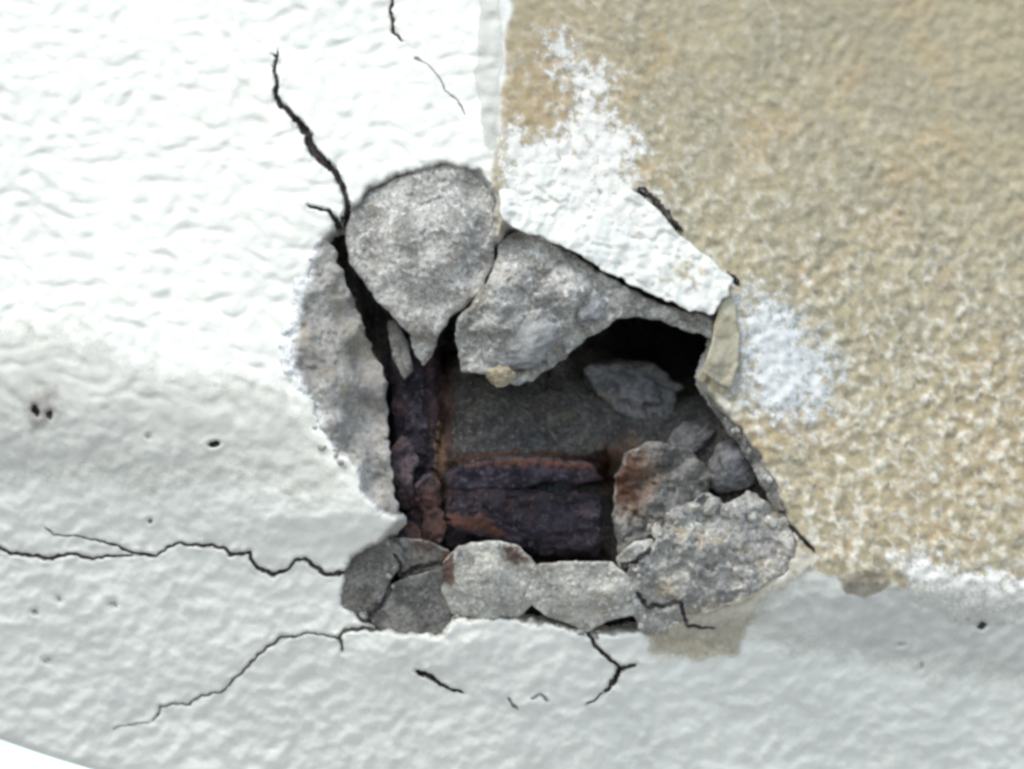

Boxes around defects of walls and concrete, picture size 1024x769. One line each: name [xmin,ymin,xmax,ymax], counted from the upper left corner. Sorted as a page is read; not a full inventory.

crack [389,0,465,114]
crack [272,50,351,230]
spalling [278,24,821,646]
rust [408,351,652,584]
crack [0,528,346,577]
crack [113,553,448,730]
crack [416,670,463,693]
crack [507,693,548,710]
crack [585,632,636,705]